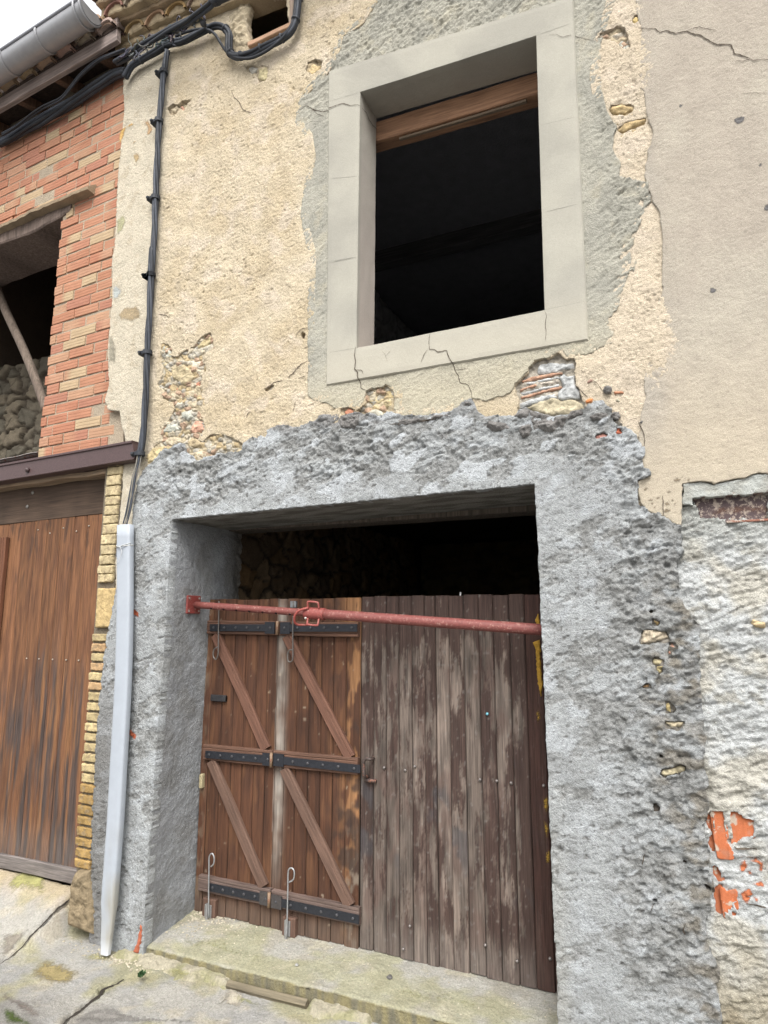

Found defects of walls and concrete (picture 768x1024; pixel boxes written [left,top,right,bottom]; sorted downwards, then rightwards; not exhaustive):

spalling [599,16,638,49]
crack [646,26,768,61]
spalling [609,103,646,137]
spalling [146,334,242,464]
crack [421,335,473,400]
spalling [516,354,593,417]
spalling [704,811,763,919]